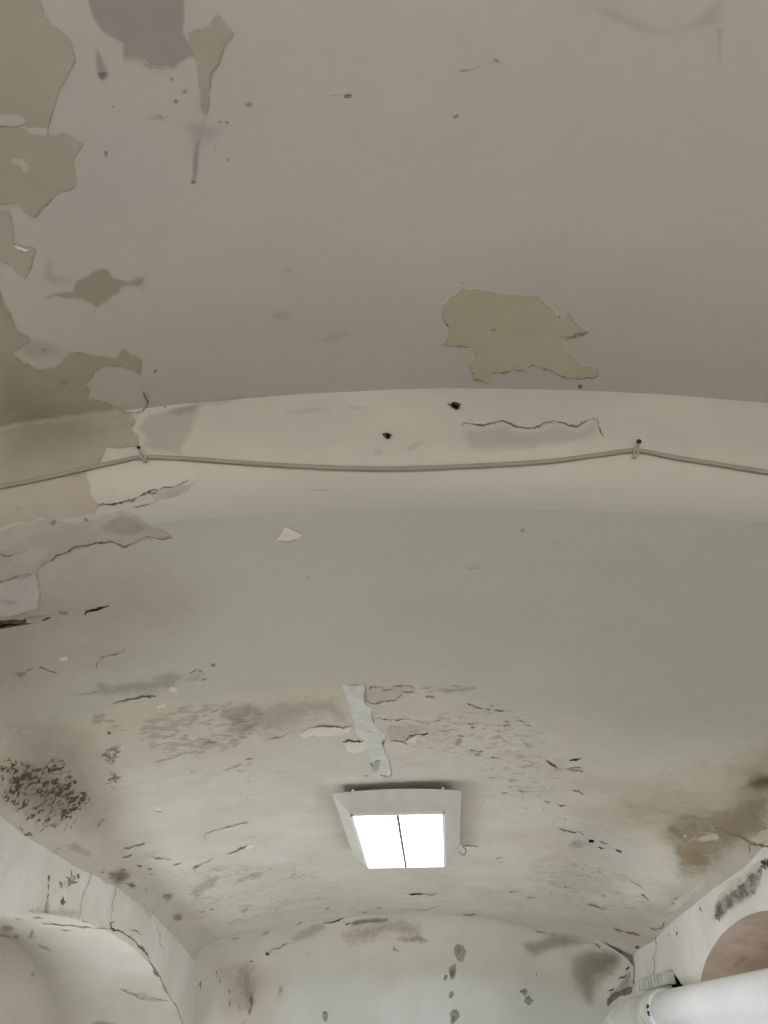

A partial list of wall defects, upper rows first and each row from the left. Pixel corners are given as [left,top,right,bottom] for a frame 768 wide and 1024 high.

peeling [188,15,234,115]
peeling [0,0,83,279]
peeling [439,282,602,389]
peeling [0,296,141,484]
peeling [0,511,172,616]
peeling [269,725,351,740]
peeling [365,685,461,705]
water stain [0,758,90,836]
water stain [683,822,719,843]
crack [42,870,183,1023]